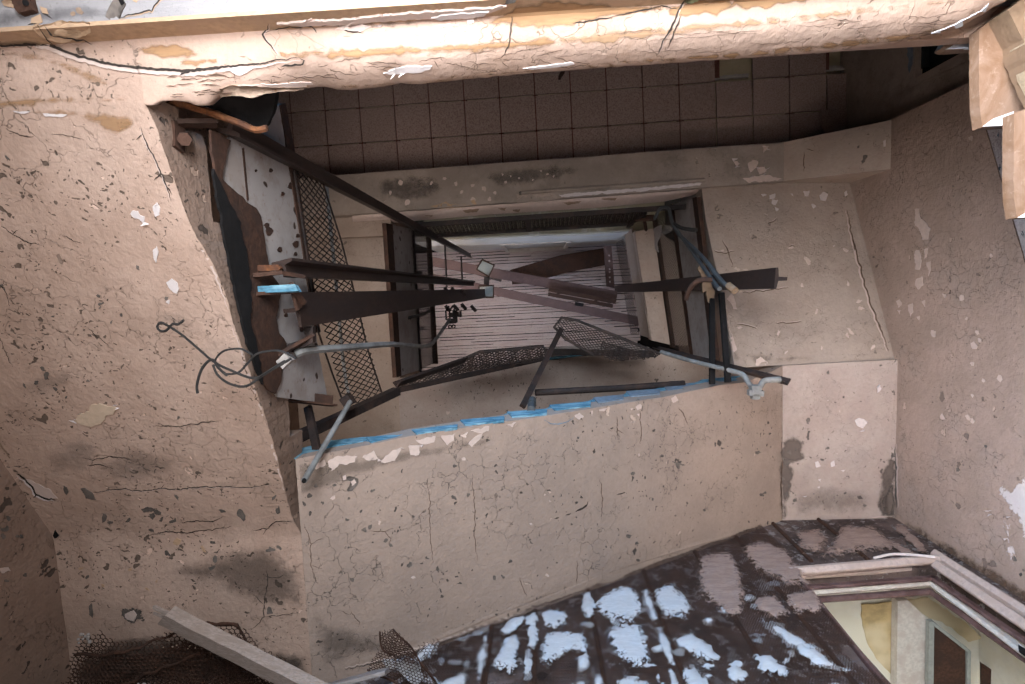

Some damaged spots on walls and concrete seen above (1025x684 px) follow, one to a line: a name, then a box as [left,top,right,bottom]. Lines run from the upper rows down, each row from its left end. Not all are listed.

crack [0,0,593,97]
peeling [277,4,507,32]
peeling [383,65,432,79]
water stain [280,0,806,59]
peeling [523,62,574,70]
crack [573,0,968,54]
crack [137,129,171,201]
crack [16,474,55,501]
peeling [302,426,489,516]
water stain [781,439,804,517]
water stain [878,459,895,517]
peeling [999,479,1025,577]